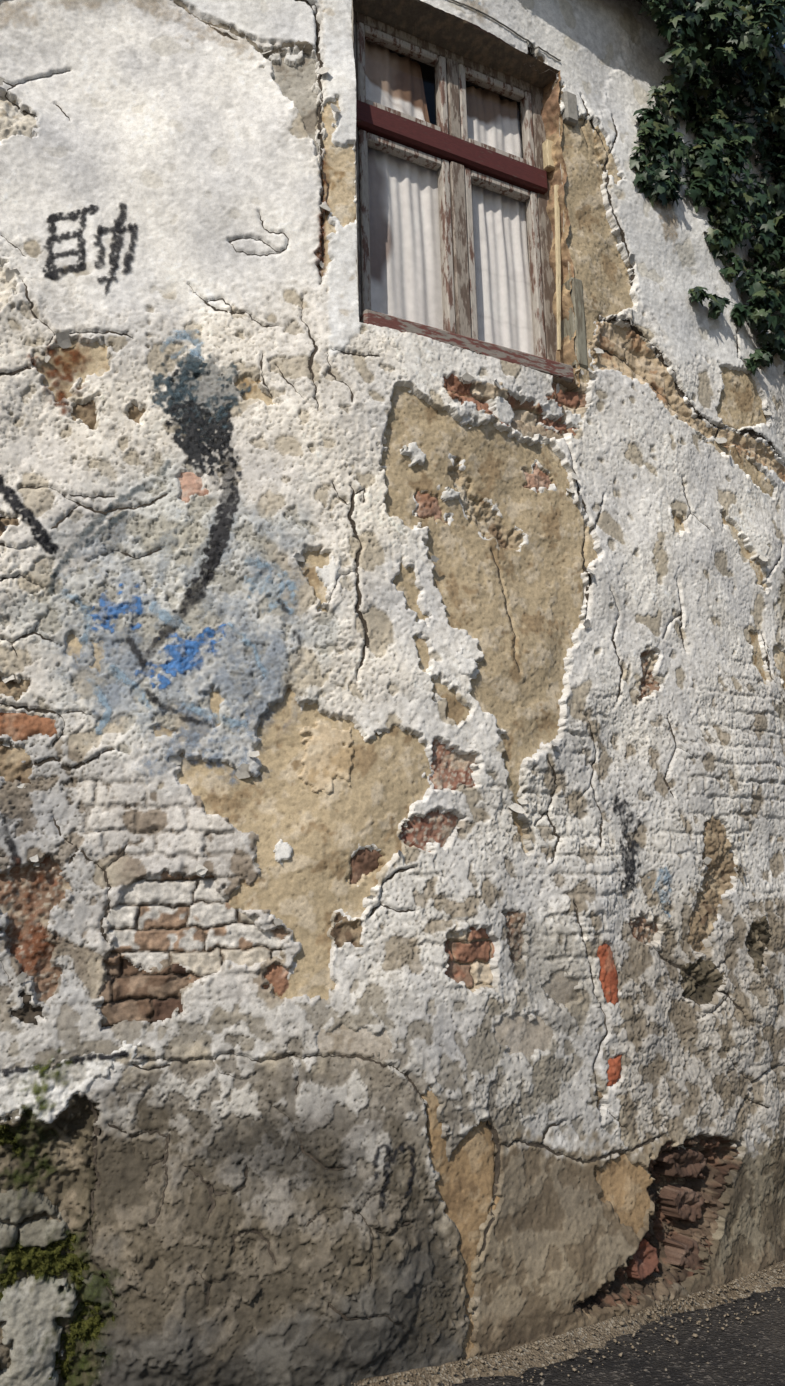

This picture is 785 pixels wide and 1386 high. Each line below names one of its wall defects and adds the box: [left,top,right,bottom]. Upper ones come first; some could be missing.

flaking render [173,0,356,277]
crack [189,0,379,410]
crack [0,235,133,375]
flaking render [379,109,785,853]
crack [328,482,369,680]
flaking render [0,855,72,1003]
flaking render [97,687,477,1028]
flaking render [685,816,745,952]
crack [478,903,661,1257]
flaking render [0,1188,67,1251]
spalling [573,1134,743,1314]
flaking render [0,1273,111,1386]